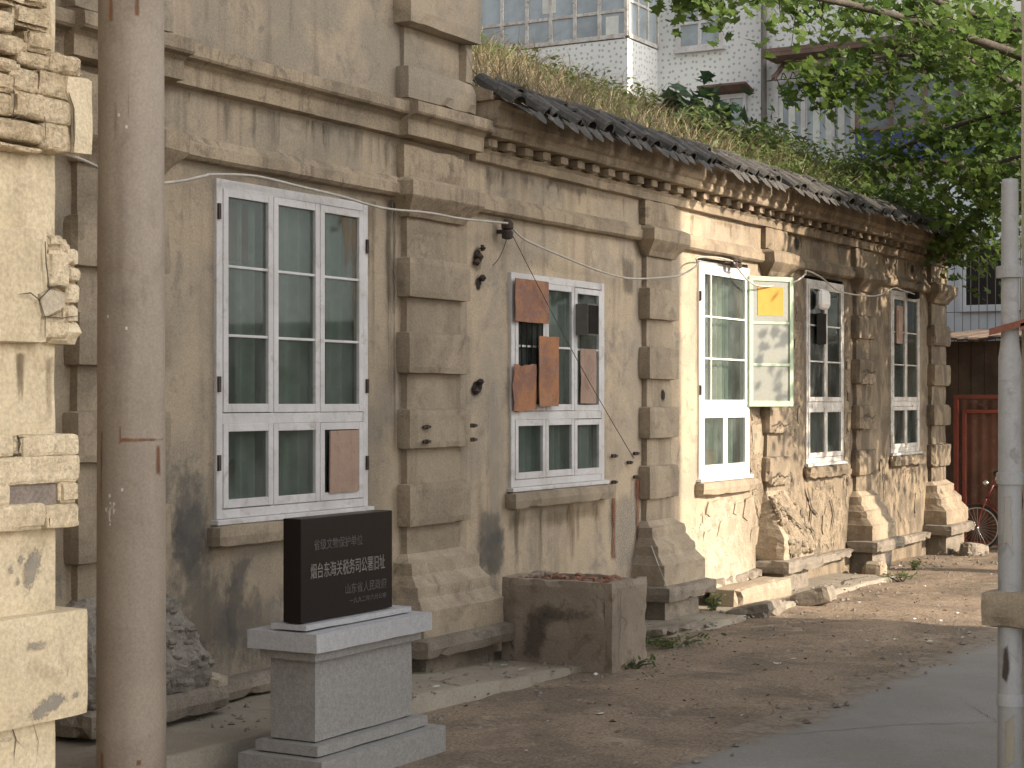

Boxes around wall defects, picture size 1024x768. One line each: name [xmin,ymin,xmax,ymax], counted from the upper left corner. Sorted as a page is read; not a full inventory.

crack [16,242,82,332]
spalling [699,295,877,558]
rust [121,439,160,473]
peeling [9,549,42,589]
peeling [34,692,78,720]